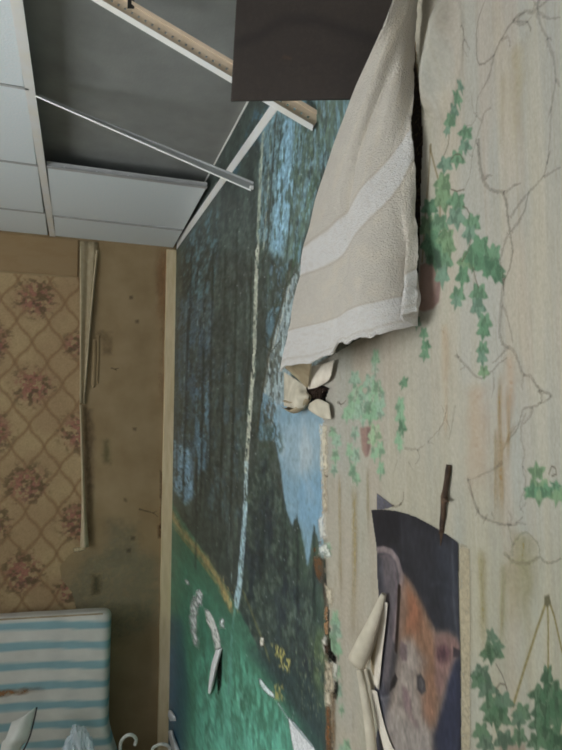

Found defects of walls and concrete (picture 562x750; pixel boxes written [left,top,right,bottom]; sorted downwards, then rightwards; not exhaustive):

peeling [322,639,338,705]